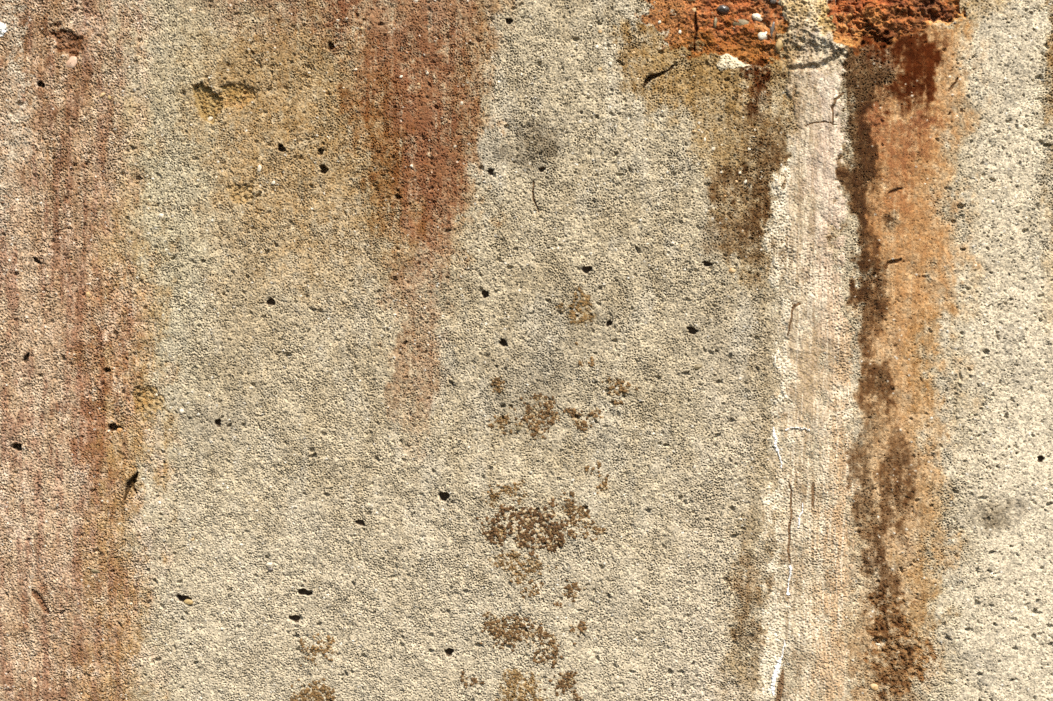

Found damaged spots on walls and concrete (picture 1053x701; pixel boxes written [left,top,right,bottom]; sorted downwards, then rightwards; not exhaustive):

spalling [635,0,789,70]
spalling [827,0,966,59]
rust [861,30,941,109]
leakage [737,0,892,701]
crack [773,427,815,595]
crack [771,640,786,701]